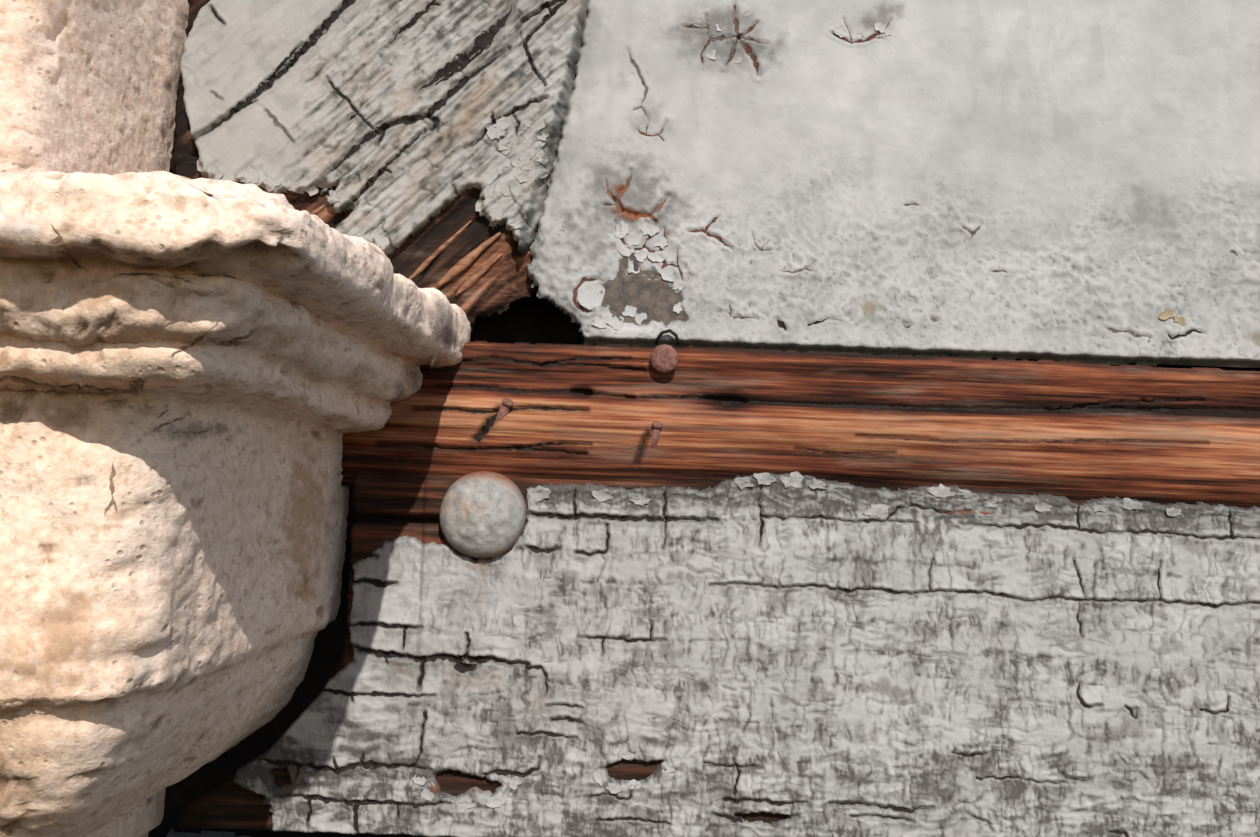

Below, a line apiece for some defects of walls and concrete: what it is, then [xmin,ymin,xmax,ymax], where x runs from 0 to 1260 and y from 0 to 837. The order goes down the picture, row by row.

crack [197,0,356,141]
crack [323,0,567,201]
spalling [419,4,512,90]
peeling [197,159,340,204]
peeling [476,116,550,229]
peeling [592,220,689,330]
crack [526,488,710,556]
peeling [734,471,827,490]
peeling [928,483,972,498]
crack [715,490,1260,636]
crack [258,621,582,834]
crack [704,759,933,823]